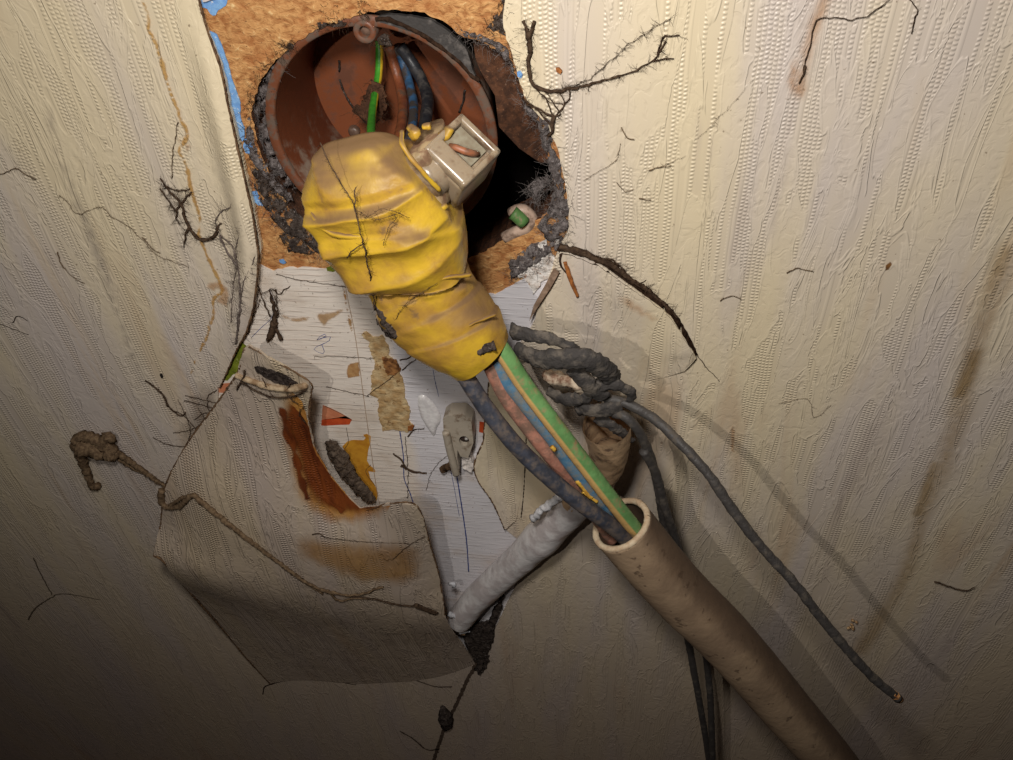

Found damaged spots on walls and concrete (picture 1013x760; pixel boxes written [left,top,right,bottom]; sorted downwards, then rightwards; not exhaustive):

peeling [201,0,228,16]
peeling [209,30,253,153]
water stain [147,23,224,351]
spalling [465,129,553,231]
peeling [153,331,476,684]
corrosion [279,394,391,519]
crack [400,662,477,760]